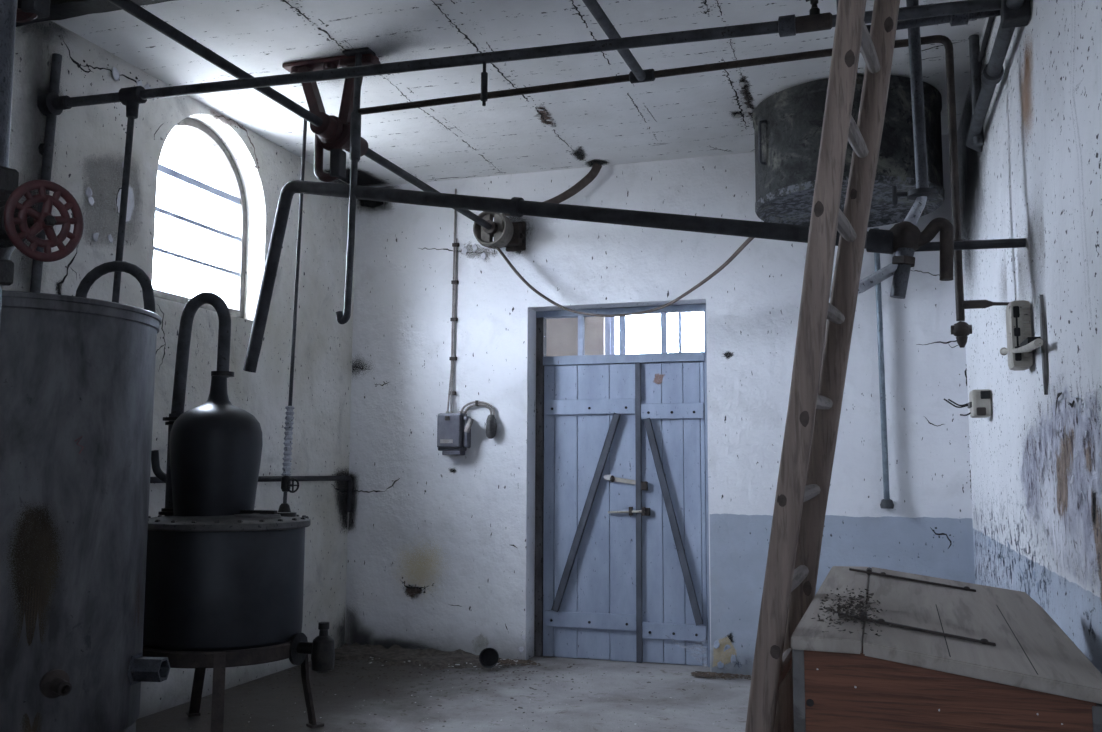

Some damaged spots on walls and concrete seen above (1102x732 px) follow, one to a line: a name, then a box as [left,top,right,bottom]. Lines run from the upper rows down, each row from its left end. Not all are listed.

crack [59,35,163,138]
crack [379,74,506,181]
crack [431,0,586,169]
mould [333,466,359,534]
crack [331,478,400,493]
peeling [972,345,1102,663]
flaking render [712,632,748,671]